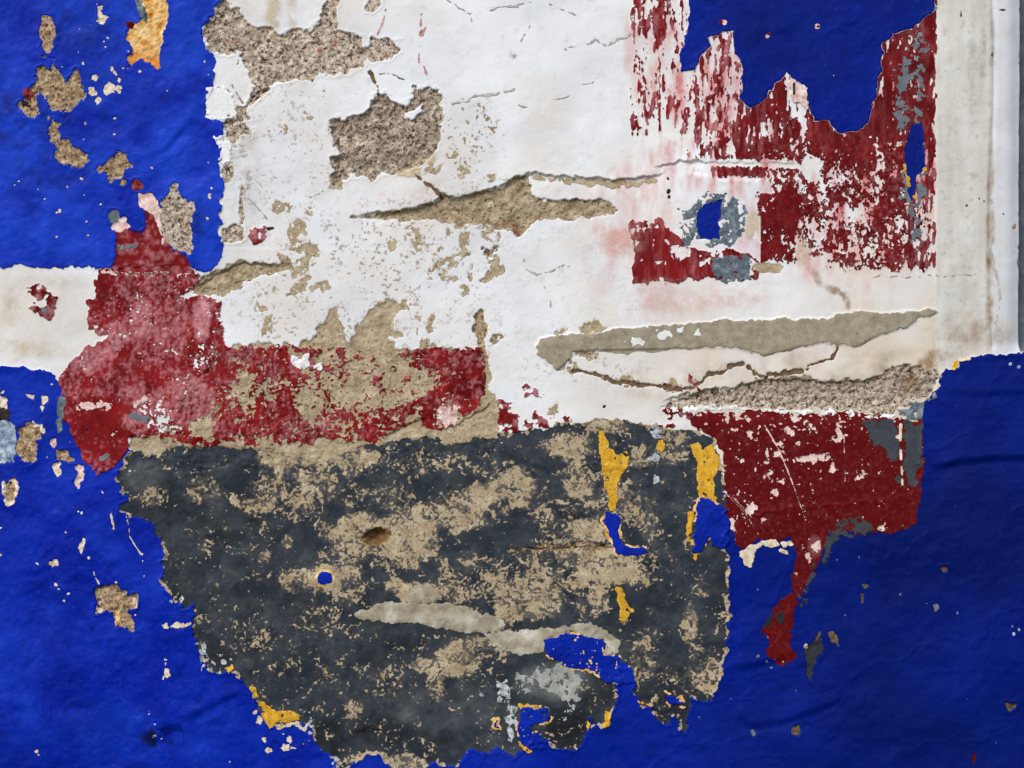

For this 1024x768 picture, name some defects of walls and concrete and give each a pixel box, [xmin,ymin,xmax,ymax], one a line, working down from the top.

peeling [17,0,169,180]
spalling [202,0,401,245]
spalling [326,85,471,190]
peeling [350,0,938,297]
peeling [0,151,942,768]